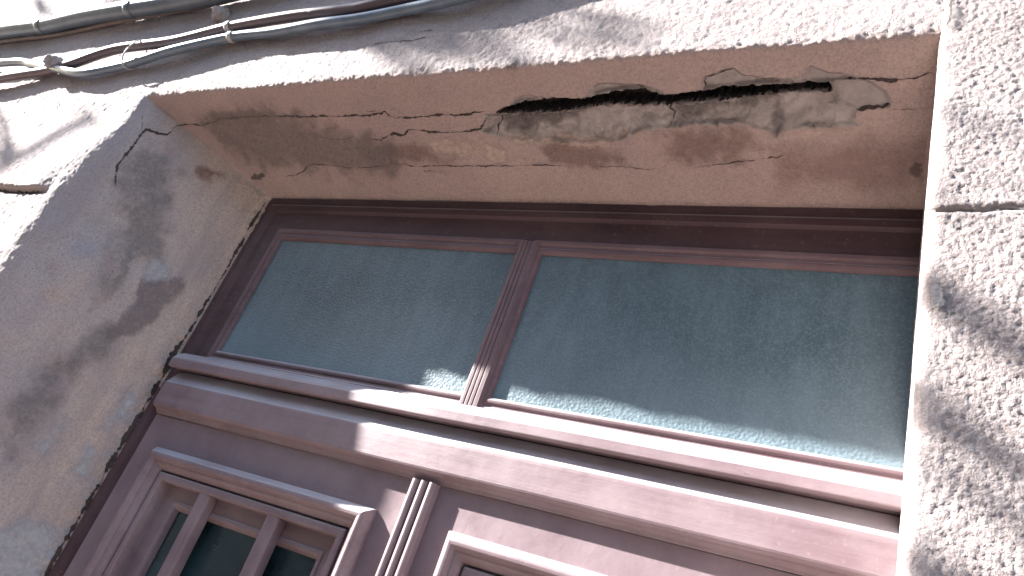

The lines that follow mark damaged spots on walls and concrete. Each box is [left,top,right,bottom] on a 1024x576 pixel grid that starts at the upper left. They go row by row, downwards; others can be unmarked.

flaking render [480,66,891,144]
crack [861,73,928,83]
crack [114,111,559,187]
crack [698,154,784,167]
leakage [81,200,184,356]